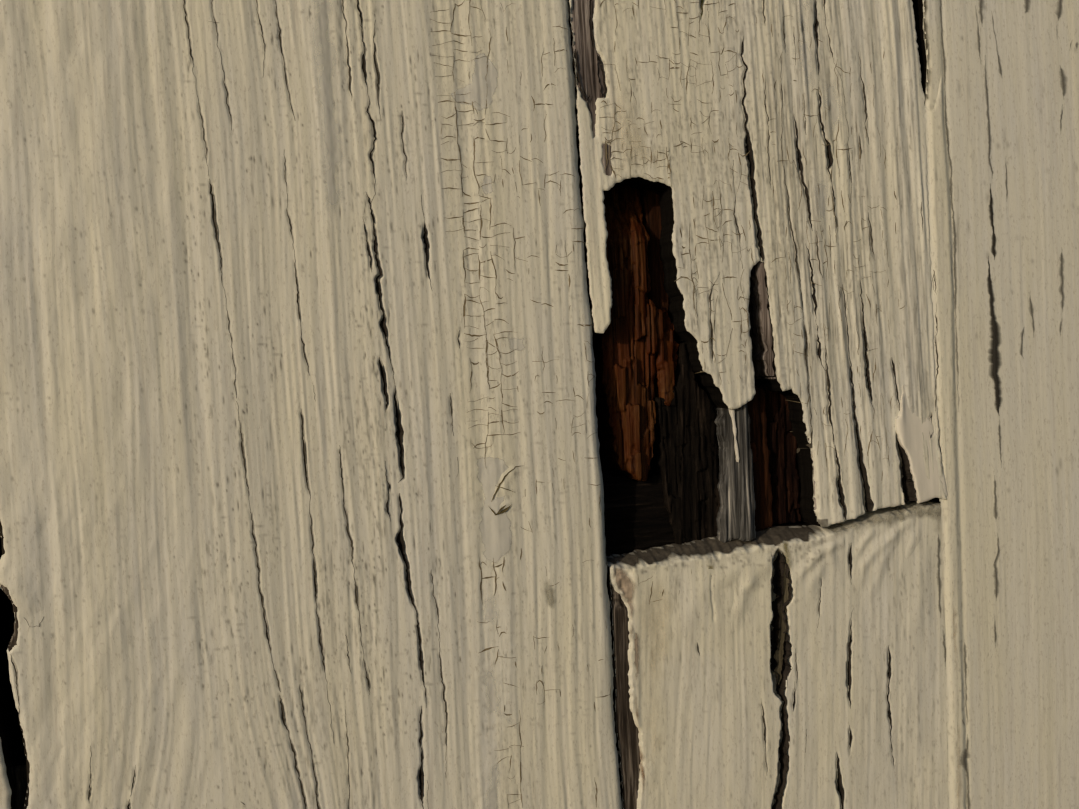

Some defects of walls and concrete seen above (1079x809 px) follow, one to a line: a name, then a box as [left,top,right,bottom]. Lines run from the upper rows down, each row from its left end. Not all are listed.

crack [1060,44,1077,122]
crack [978,0,1034,455]
crack [1058,253,1066,332]
crack [183,0,370,809]
crack [342,0,923,809]
peeling [895,385,948,503]
crack [992,546,1000,598]
crack [11,656,19,703]